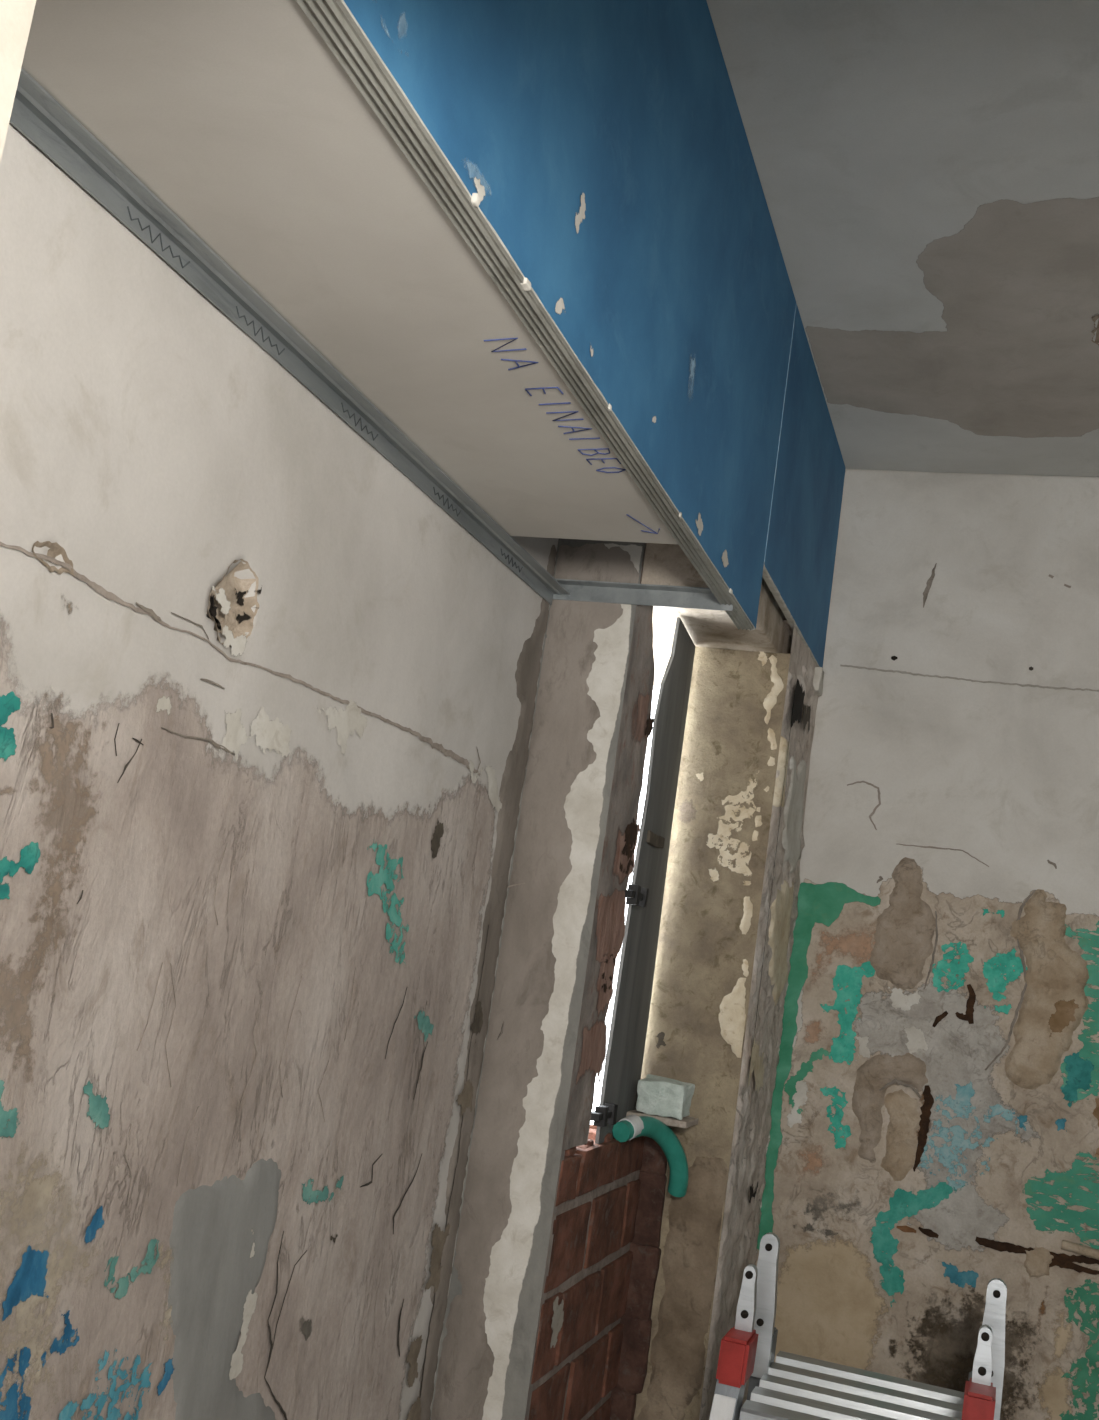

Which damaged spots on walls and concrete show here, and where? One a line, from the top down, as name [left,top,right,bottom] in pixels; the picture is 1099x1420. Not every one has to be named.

peeling [805,197,1099,438]
spalling [207,559,262,656]
crack [0,542,481,783]
flaking render [0,621,502,1420]
crack [445,925,504,1229]
flaking render [576,817,640,1084]
flaking render [699,652,1099,1420]
crack [264,1231,338,1420]
crack [397,1263,441,1398]
damp [889,1288,986,1392]
damp [1000,1320,1036,1420]
crack [1049,1258,1099,1275]